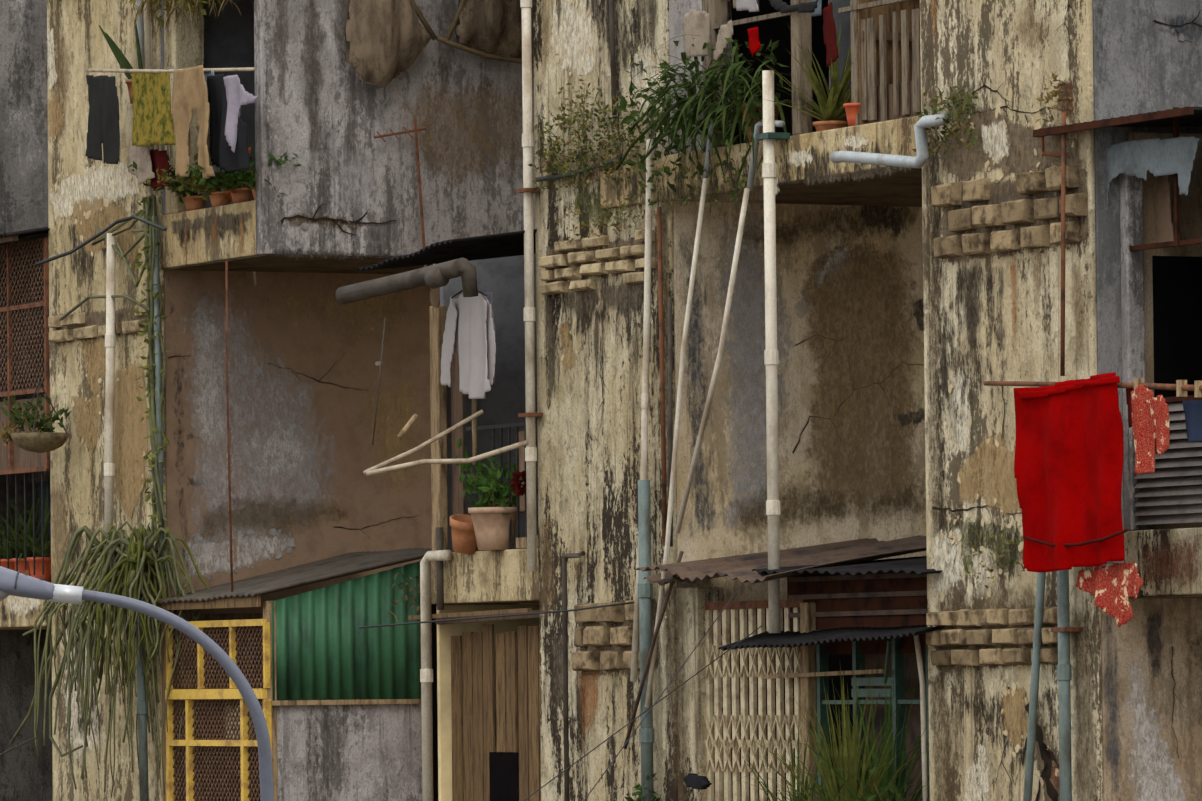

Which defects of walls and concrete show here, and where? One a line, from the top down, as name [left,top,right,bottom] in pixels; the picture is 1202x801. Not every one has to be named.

water stain [542,0,656,104]
crack [1153,10,1202,43]
spalling [939,103,1081,181]
water stain [172,212,251,252]
crack [264,179,397,235]
water stain [544,131,1021,585]
crack [792,325,924,463]
peeling [929,364,1024,602]
water stain [1147,612,1162,677]